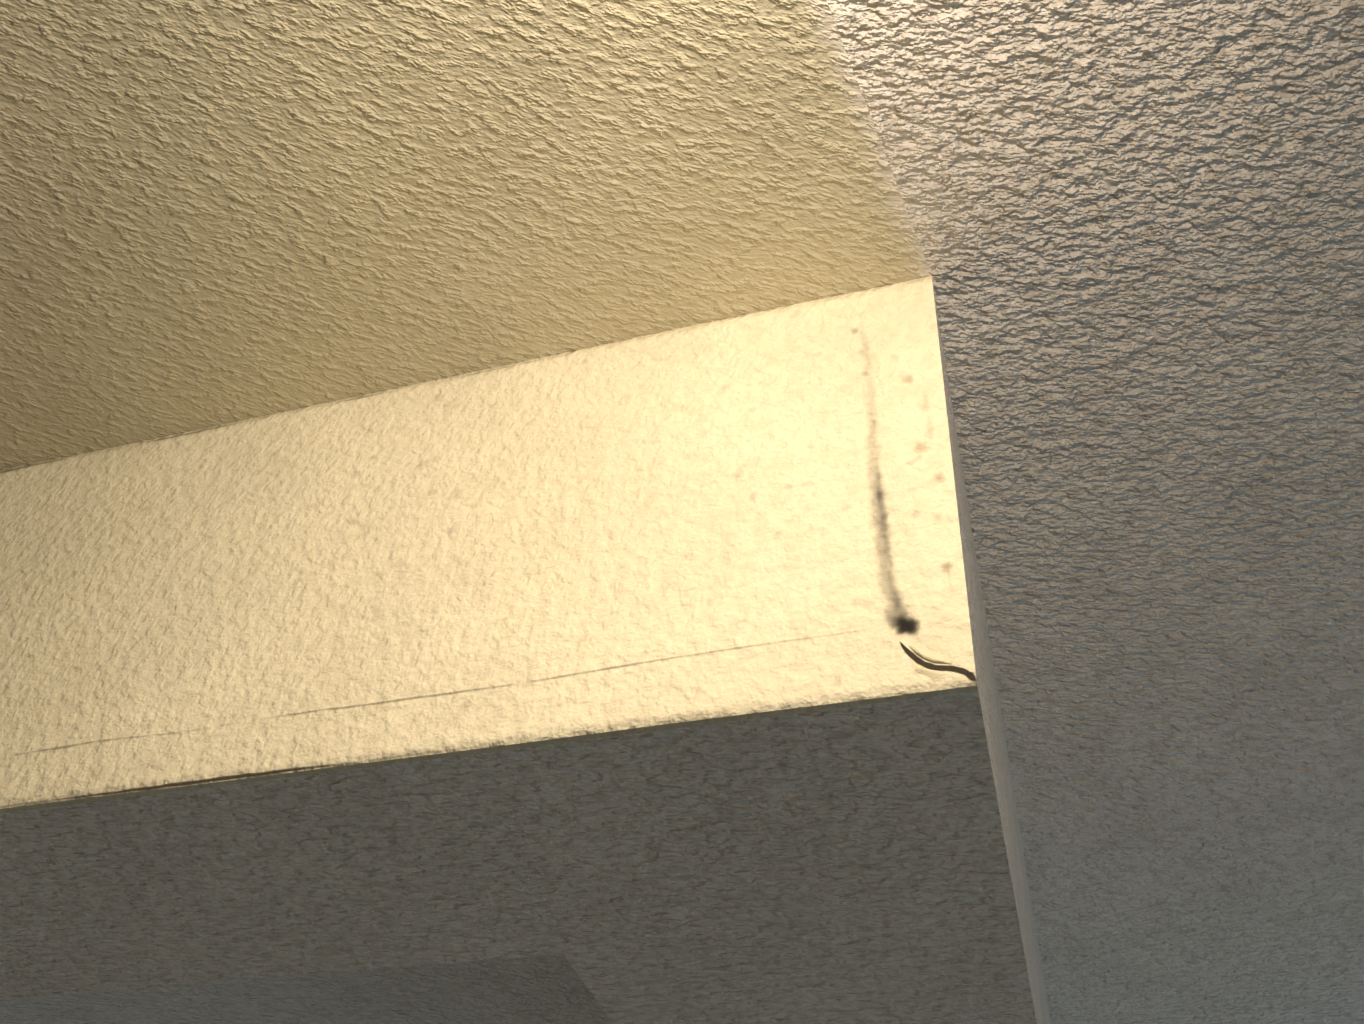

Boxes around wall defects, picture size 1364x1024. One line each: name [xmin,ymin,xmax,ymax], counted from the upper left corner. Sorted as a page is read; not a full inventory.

crack [900,642,976,681]